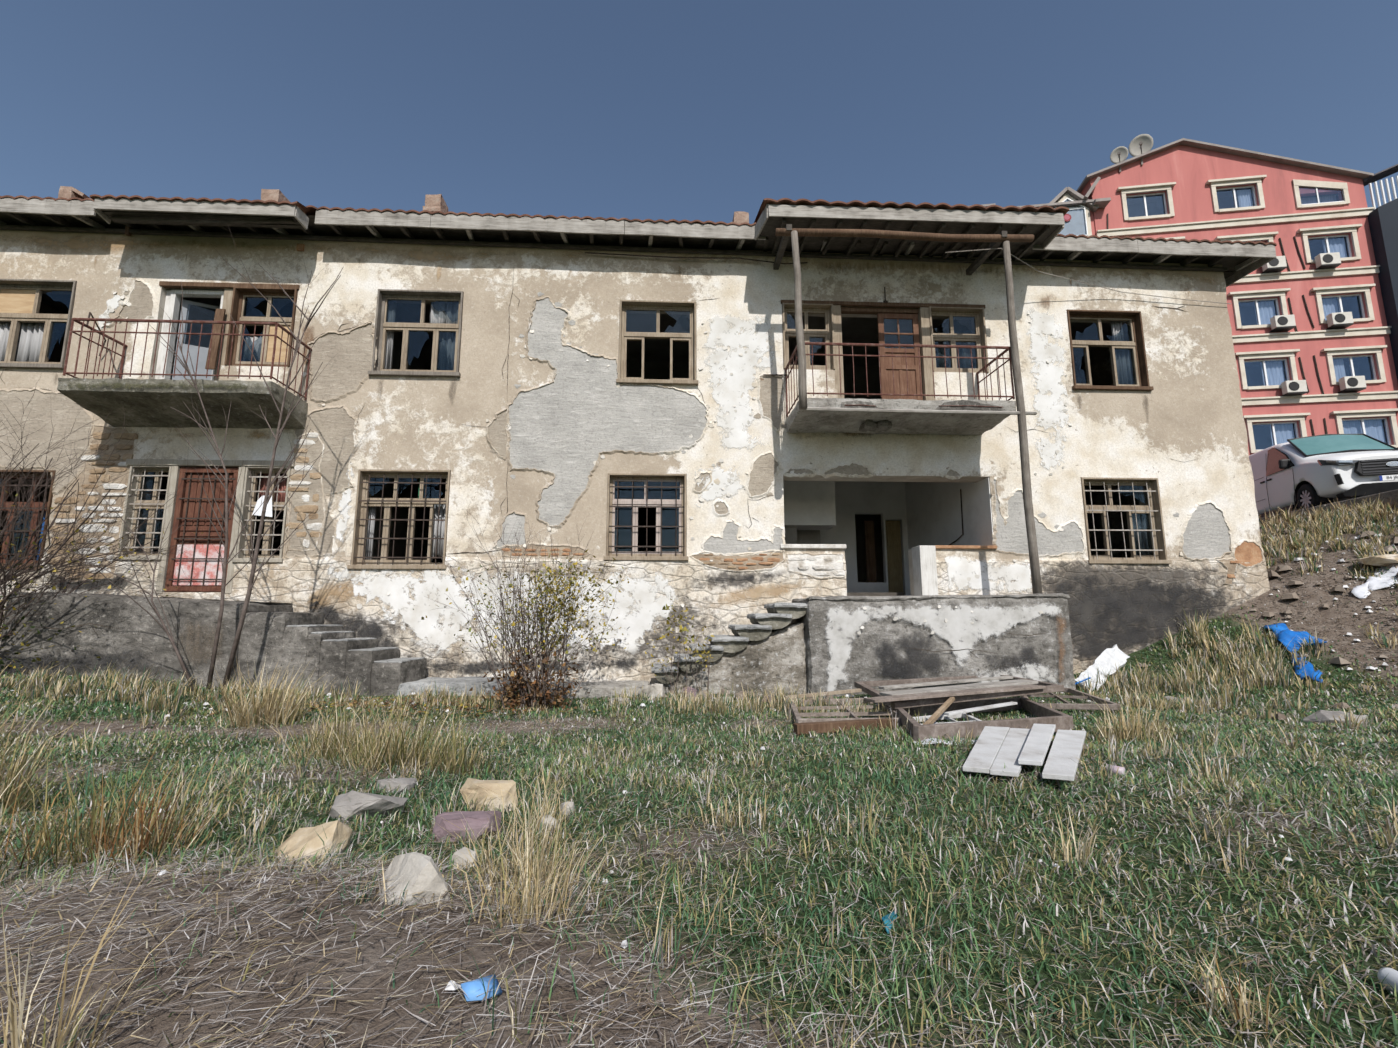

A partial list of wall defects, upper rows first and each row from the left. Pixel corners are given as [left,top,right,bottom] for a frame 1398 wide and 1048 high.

spalling [841,400,892,432]
spalling [936,400,1005,411]
peeling [1027,309,1073,475]
flaking render [0,386,138,584]
flaking render [283,292,875,654]
flaking render [941,467,963,480]
damp [876,634,942,679]
peeling [826,475,1086,691]
damp [1056,576,1225,659]
flaking render [1173,500,1265,586]